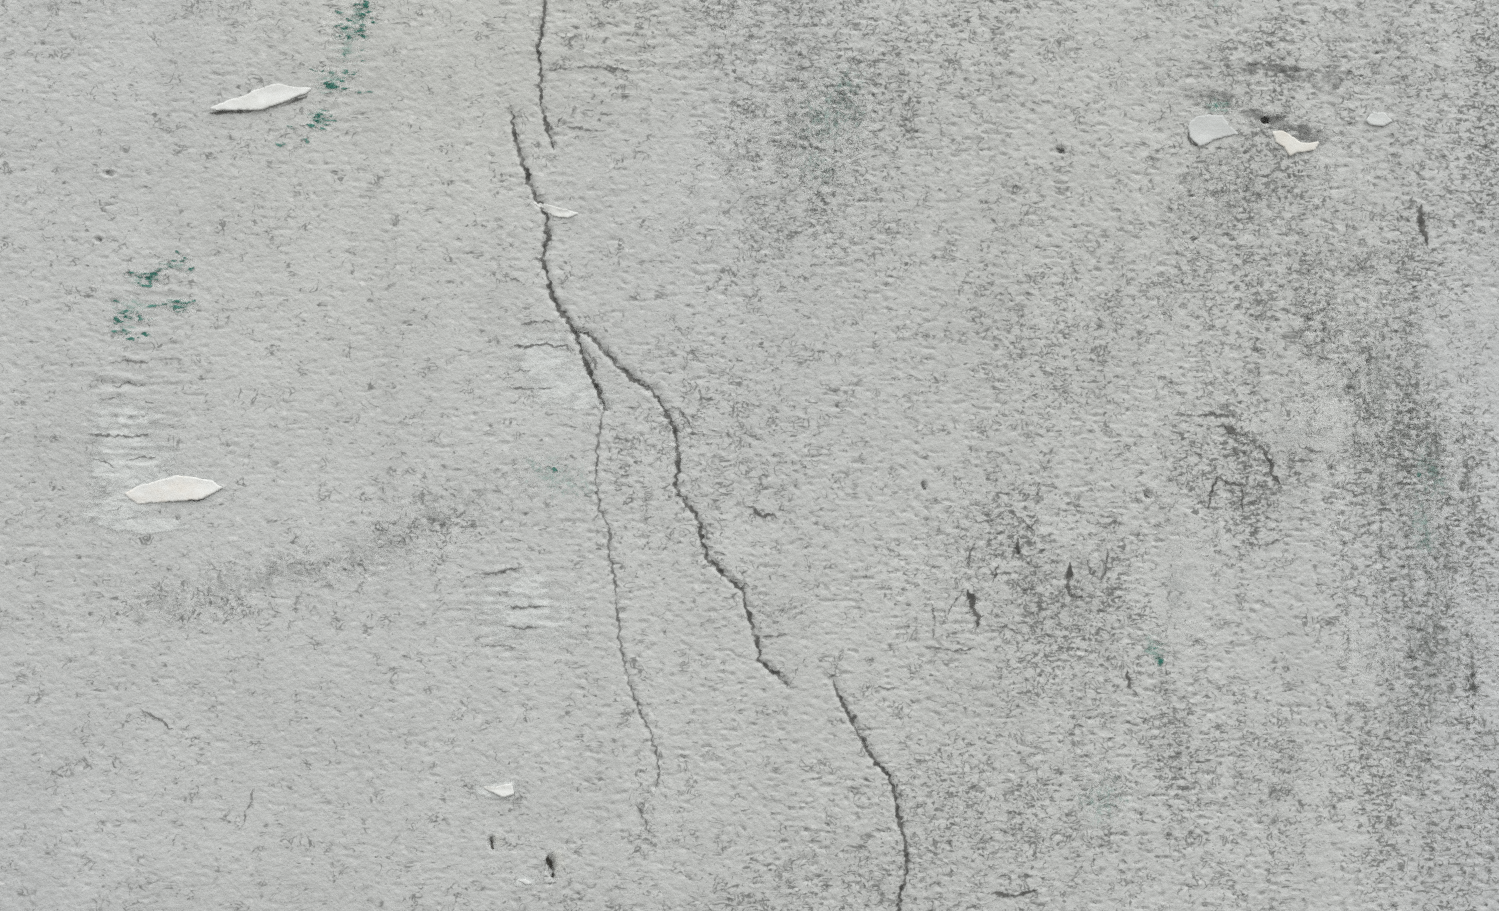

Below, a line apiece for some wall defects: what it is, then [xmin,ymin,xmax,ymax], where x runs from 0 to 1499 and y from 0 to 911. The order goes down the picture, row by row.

peeling [209,84,312,114]
peeling [1188,114,1238,146]
peeling [1272,130,1319,156]
crack [503,0,789,837]
peeling [94,472,223,534]
crack [833,681,915,911]